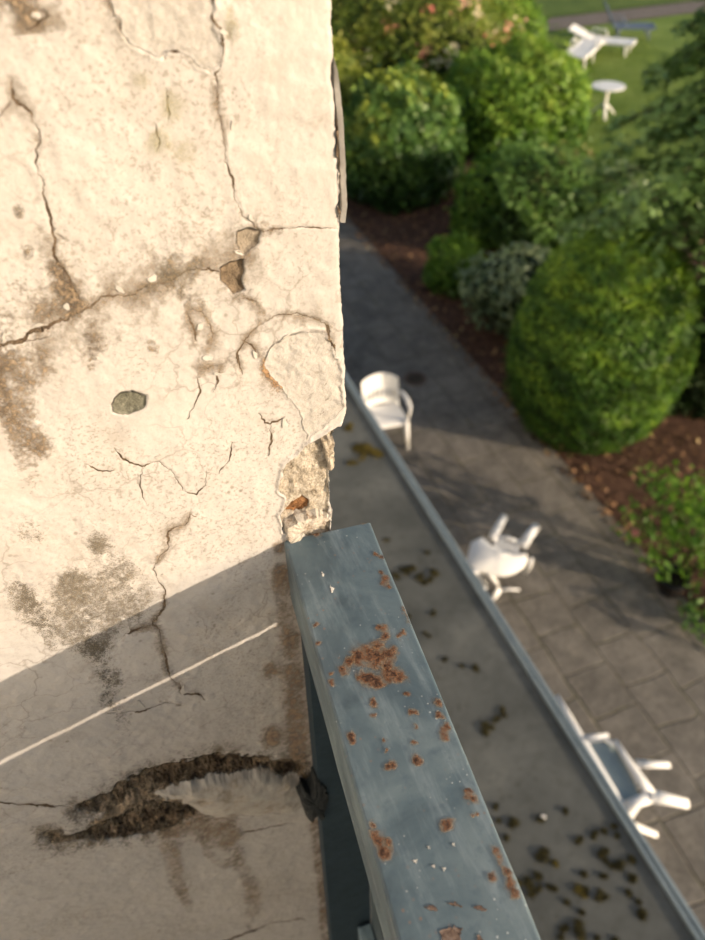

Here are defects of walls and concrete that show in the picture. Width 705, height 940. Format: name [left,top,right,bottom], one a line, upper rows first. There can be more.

crack [0,0,336,419]
spalling [220,228,260,293]
water stain [0,354,36,465]
spalling [112,391,146,415]
crack [259,413,288,456]
spalling [278,428,336,544]
crack [89,442,233,714]
corrosion [261,564,310,773]
corrosion [328,607,410,717]
crack [0,801,69,809]
corrosion [370,822,392,860]
corrosion [488,847,520,899]